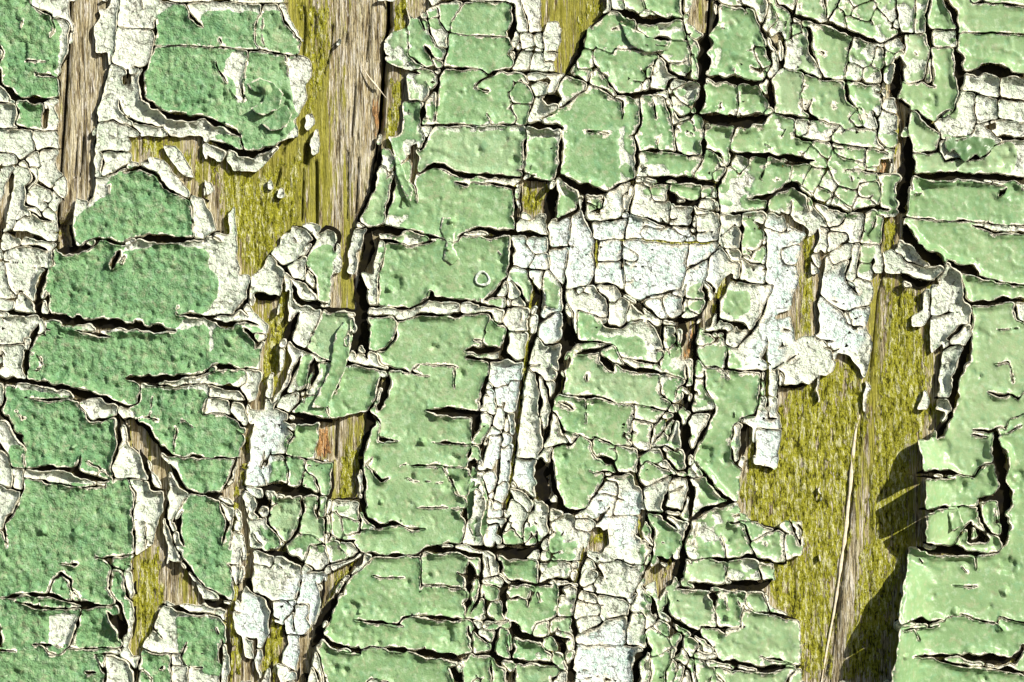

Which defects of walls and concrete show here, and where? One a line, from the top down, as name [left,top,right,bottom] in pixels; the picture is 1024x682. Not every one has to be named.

crack [0,2,71,221]
crack [0,224,262,682]
crack [88,0,302,217]
crack [176,281,280,348]
peeling [0,0,578,682]
crack [229,0,1024,682]
peeling [460,0,1024,682]